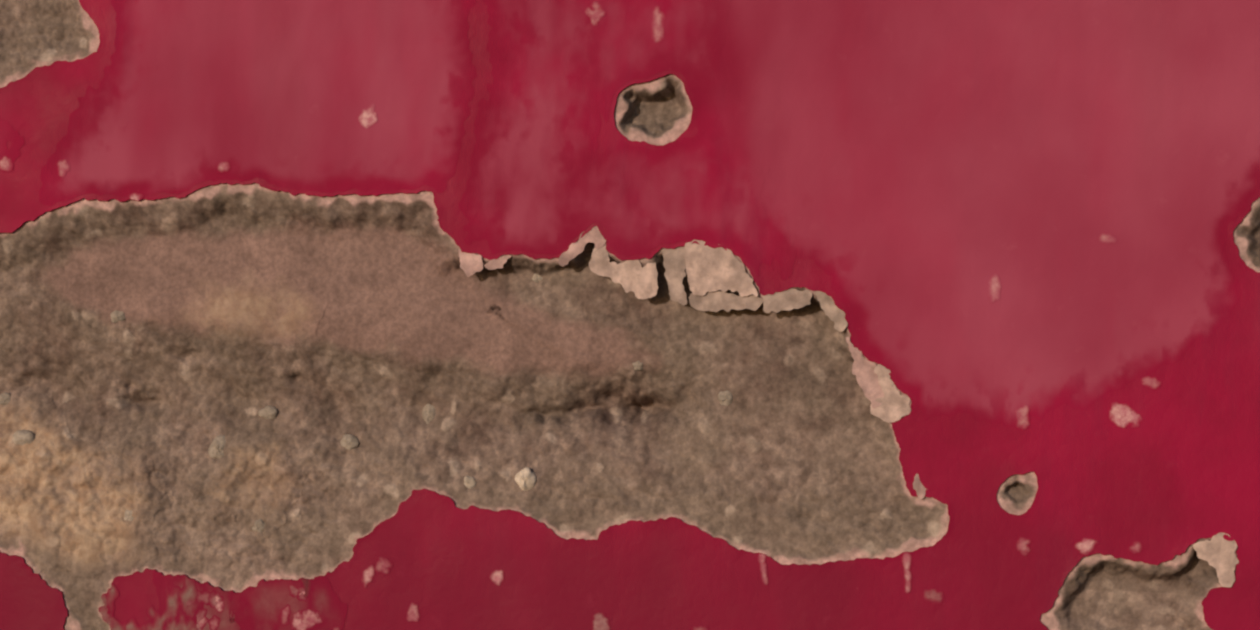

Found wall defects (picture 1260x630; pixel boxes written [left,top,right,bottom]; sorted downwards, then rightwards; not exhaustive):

spalling [0,0,100,88]
spalling [614,74,692,146]
peeling [0,155,14,172]
spalling [1233,197,1260,272]
spalling [0,159,949,630]
spalling [997,472,1038,515]
spalling [1040,532,1239,630]